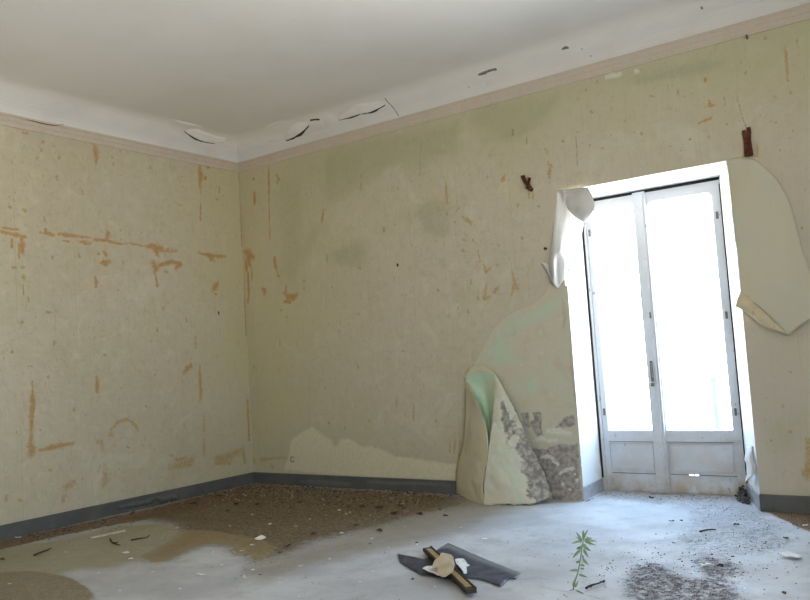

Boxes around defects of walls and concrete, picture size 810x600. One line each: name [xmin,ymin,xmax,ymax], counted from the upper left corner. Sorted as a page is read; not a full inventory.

corrosion [0,227,29,302]
corrosion [39,216,183,288]
corrosion [26,378,75,460]
peeling [473,283,584,501]